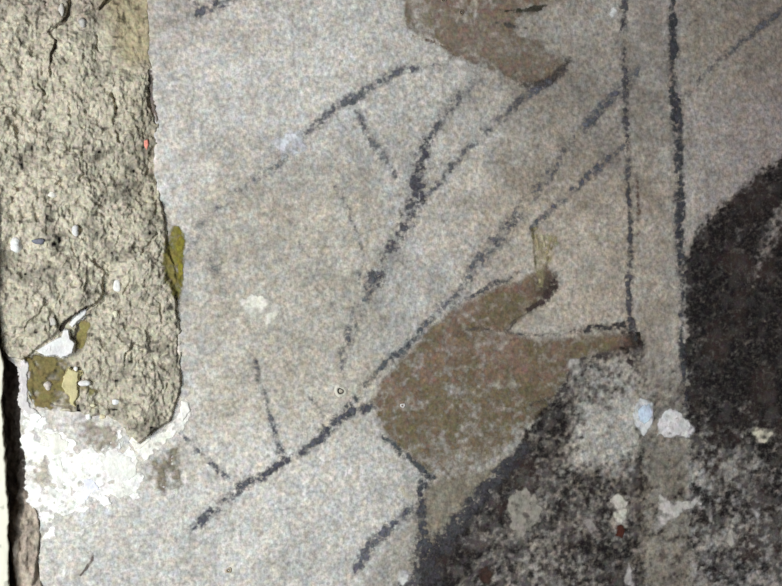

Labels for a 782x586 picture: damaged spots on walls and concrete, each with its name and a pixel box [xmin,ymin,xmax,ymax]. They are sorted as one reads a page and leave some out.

crack [49,1,70,61]
spalling [0,0,191,552]
crack [60,306,88,330]
peeling [657,409,694,438]